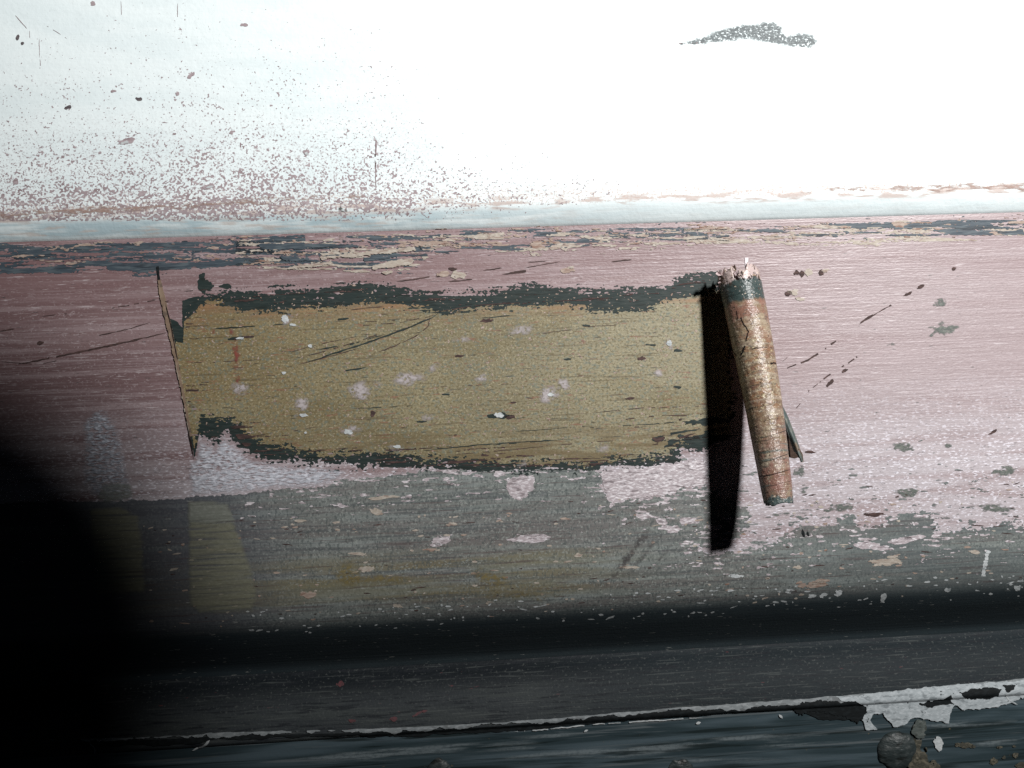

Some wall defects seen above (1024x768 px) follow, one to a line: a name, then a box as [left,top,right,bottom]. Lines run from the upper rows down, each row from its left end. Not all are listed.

peeling [0,214,1024,277]
peeling [437,267,466,279]
peeling [487,402,516,420]
peeling [894,439,925,452]
peeling [0,449,1024,675]
peeling [779,680,1024,730]